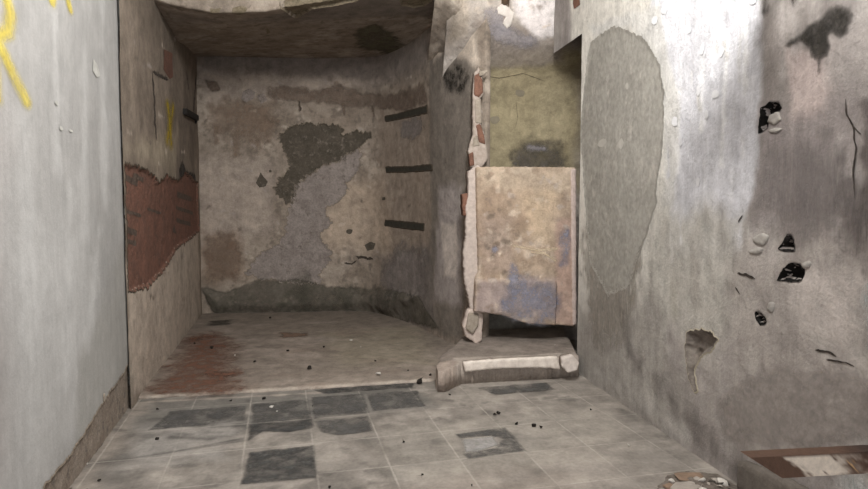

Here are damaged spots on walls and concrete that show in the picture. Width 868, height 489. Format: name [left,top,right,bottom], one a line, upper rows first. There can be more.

flaking render [279,0,358,19]
flaking render [497,0,514,29]
flaking render [123,161,200,294]
flaking render [244,122,372,286]
flaking render [460,165,483,343]